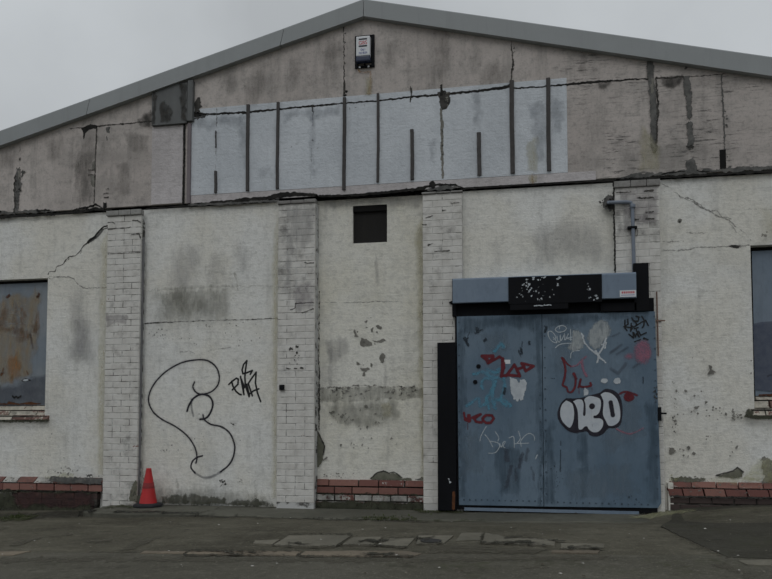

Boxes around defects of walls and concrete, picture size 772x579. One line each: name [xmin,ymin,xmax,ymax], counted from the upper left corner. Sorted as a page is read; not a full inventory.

flaking render [647,61,660,153]
flaking render [683,66,697,173]
crack [0,27,772,289]
flaking render [13,167,25,213]
peeling [353,317,386,347]
peeling [327,353,416,430]
peeling [672,390,743,433]
peeling [670,467,772,499]
flaking render [758,456,772,487]